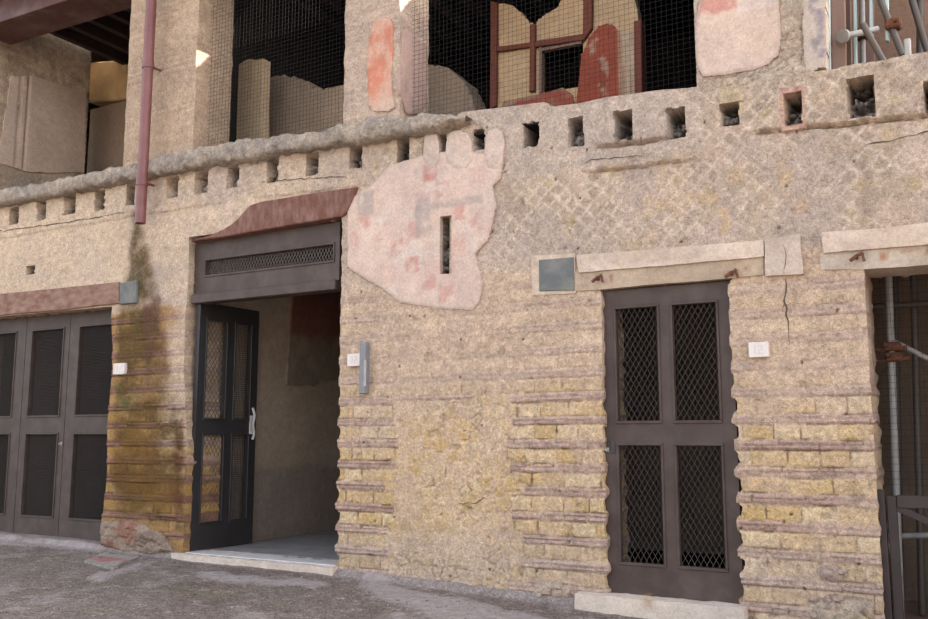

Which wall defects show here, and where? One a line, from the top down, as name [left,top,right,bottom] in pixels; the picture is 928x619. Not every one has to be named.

water stain [114,224,182,519]
crack [782,245,790,343]